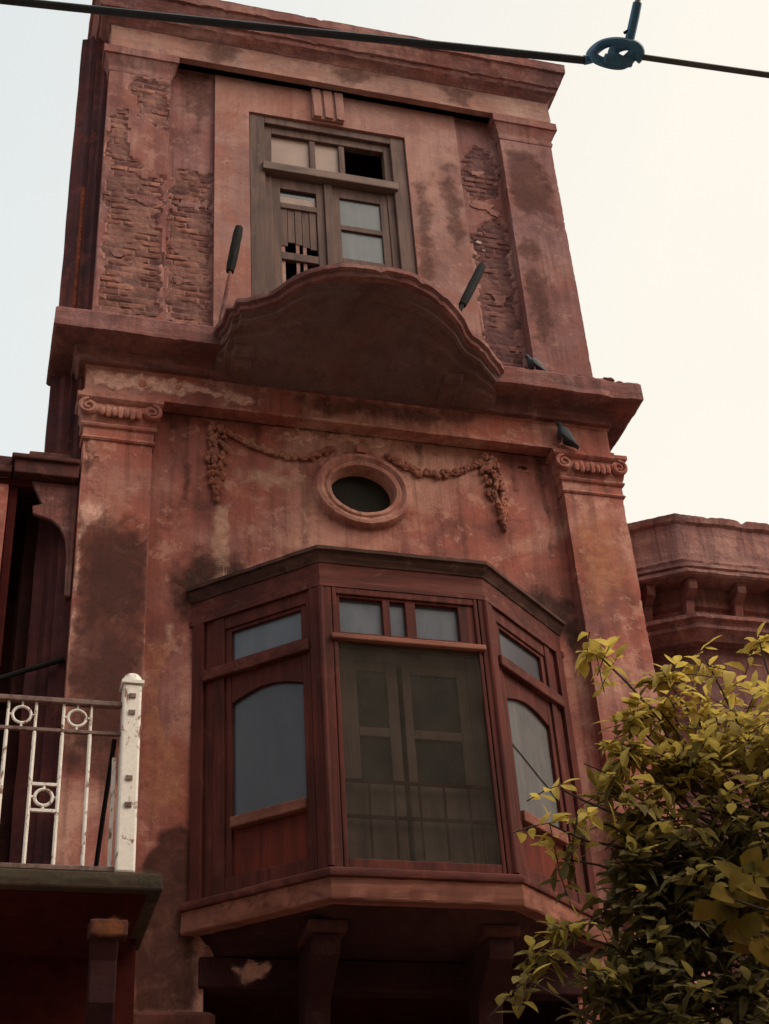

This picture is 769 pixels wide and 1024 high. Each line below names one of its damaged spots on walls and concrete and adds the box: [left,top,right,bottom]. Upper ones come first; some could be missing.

flaking render [98,79,213,326]
flaking render [460,148,527,369]
peeling [90,370,254,405]
leakage [62,517,147,781]
leakage [174,509,243,614]
peeling [233,962,271,982]